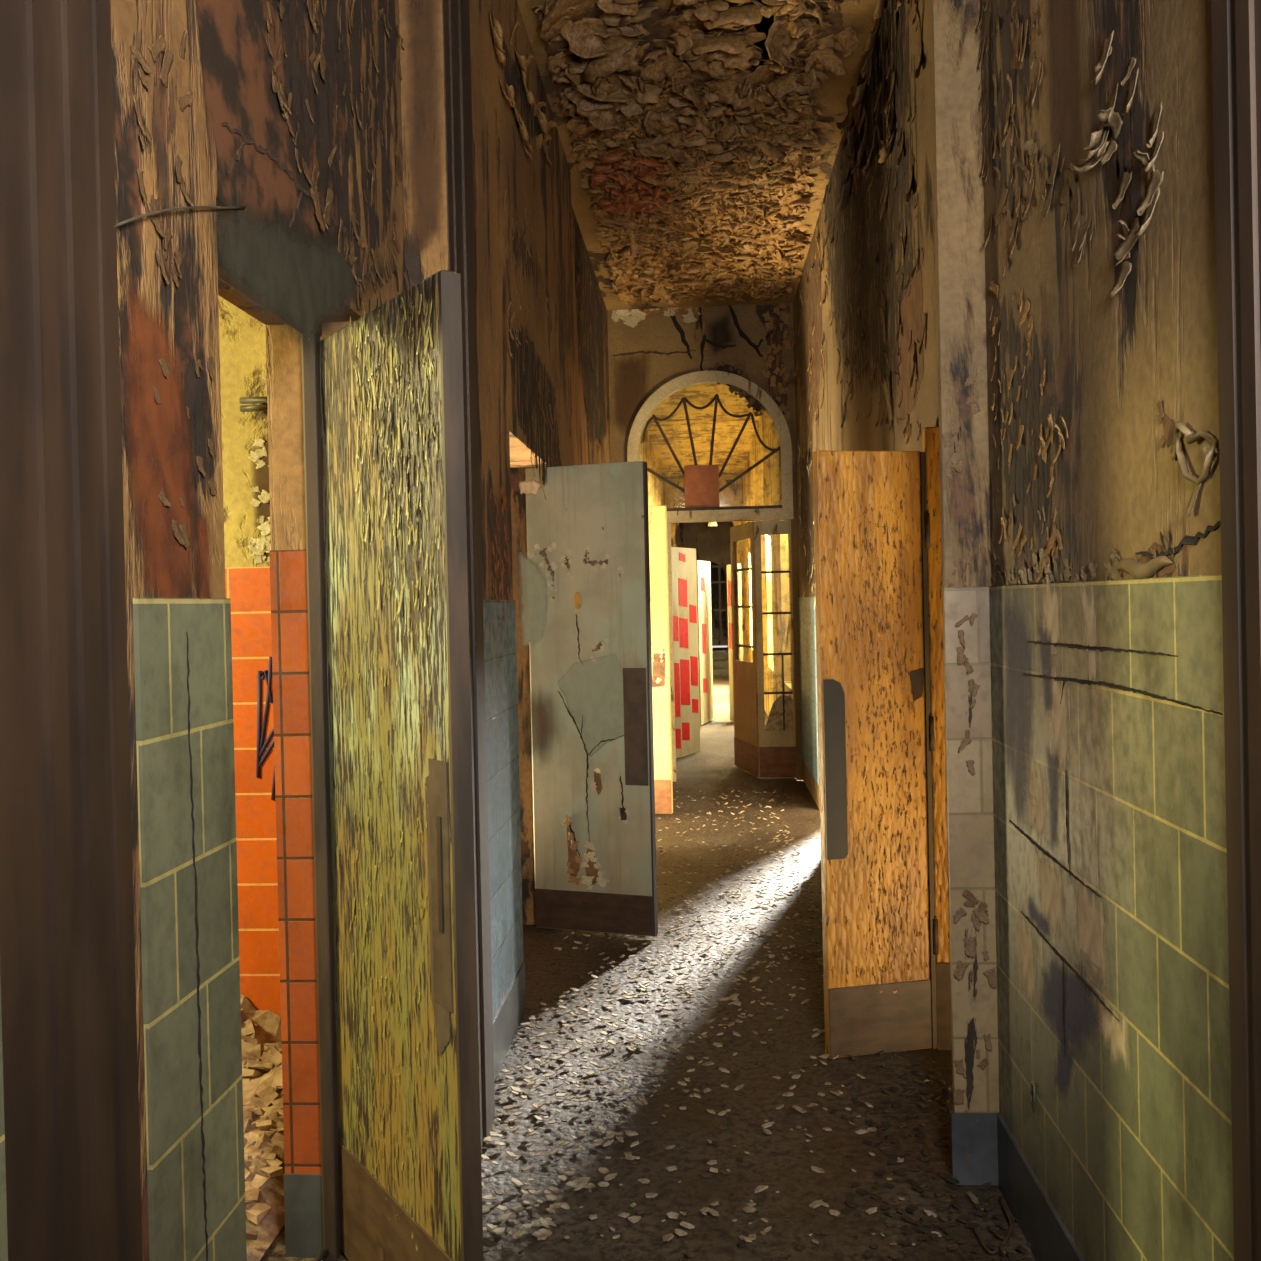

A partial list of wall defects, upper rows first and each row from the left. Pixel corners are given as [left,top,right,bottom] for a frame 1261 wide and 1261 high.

crack [613,306,773,371]
peeling [490,0,927,627]
peeling [941,0,1181,588]
crack [1023,641,1223,715]
peeling [591,768,602,795]
water stain [1028,903,1048,934]